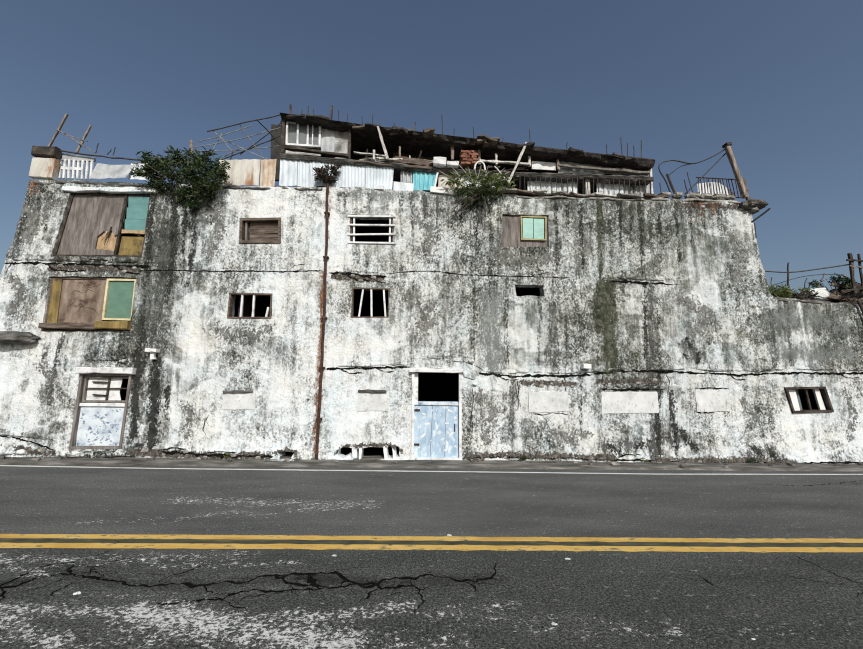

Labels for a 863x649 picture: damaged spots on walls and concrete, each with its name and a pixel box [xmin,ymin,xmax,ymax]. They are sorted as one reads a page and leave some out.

crack [5,259,569,286]
damp [38,333,68,406]
damp [129,184,213,452]
corrosion [312,271,324,453]
crack [327,366,409,374]
damp [343,188,521,441]
damp [537,299,569,371]
damp [550,198,733,462]
crack [455,361,863,430]
crack [0,434,52,450]
crack [469,452,681,462]
mould [739,441,787,463]